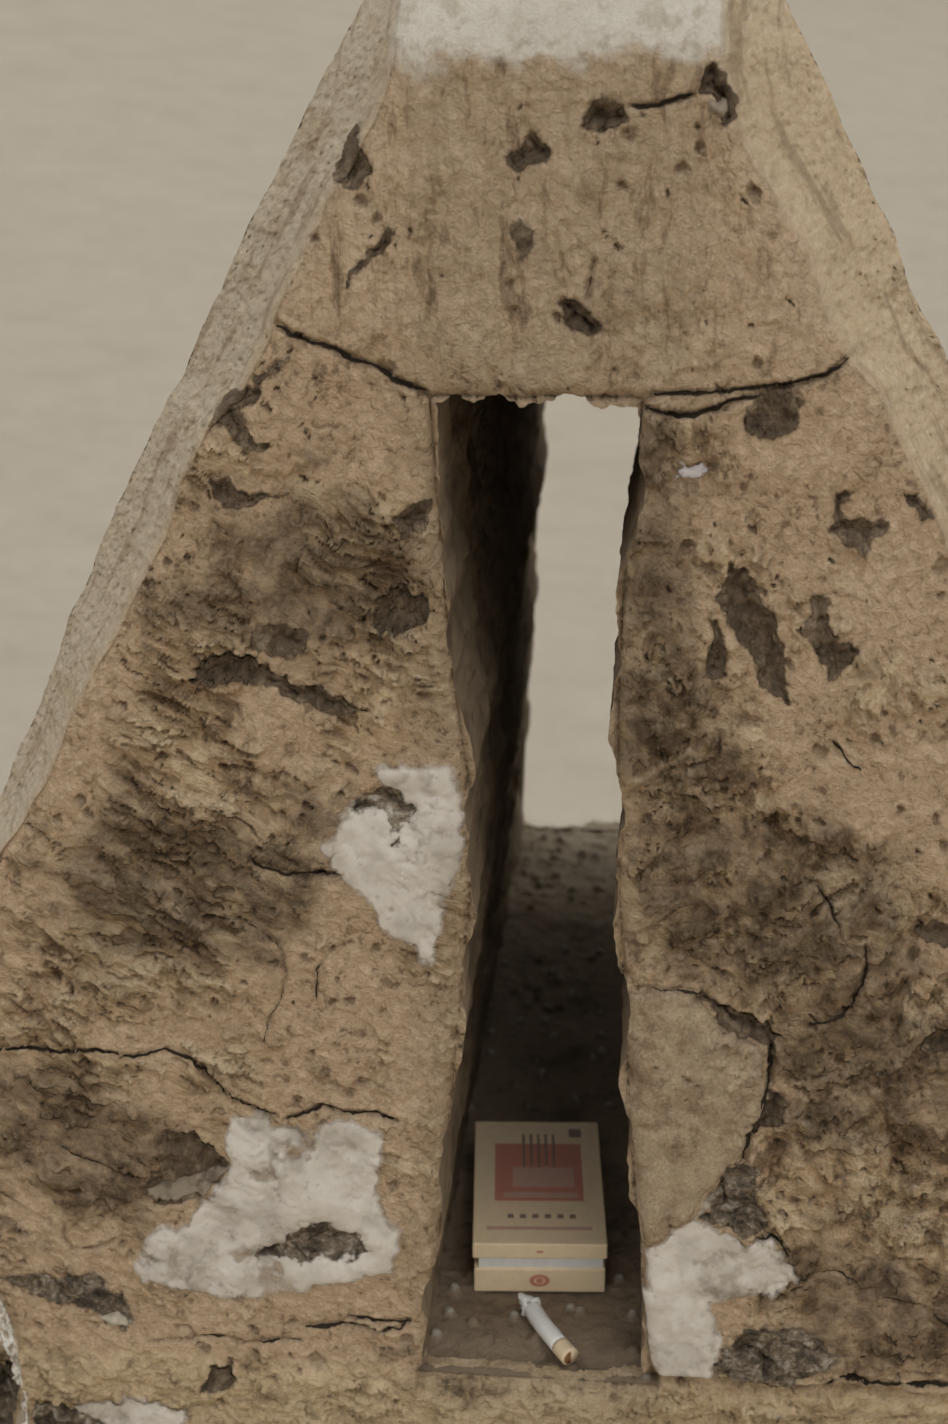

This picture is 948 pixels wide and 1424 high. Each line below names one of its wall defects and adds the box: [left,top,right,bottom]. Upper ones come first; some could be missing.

spalling [698,63,739,125]
crack [277,325,426,390]
crack [647,357,849,419]
spalling [745,384,804,440]
spalling [703,564,790,705]
spalling [803,596,859,681]
damp [738,860,857,987]
crack [0,1046,398,1119]
damp [792,1008,925,1142]
damp [7,1076,163,1169]
flaking render [32,1396,188,1424]
crack [826,1373,948,1388]